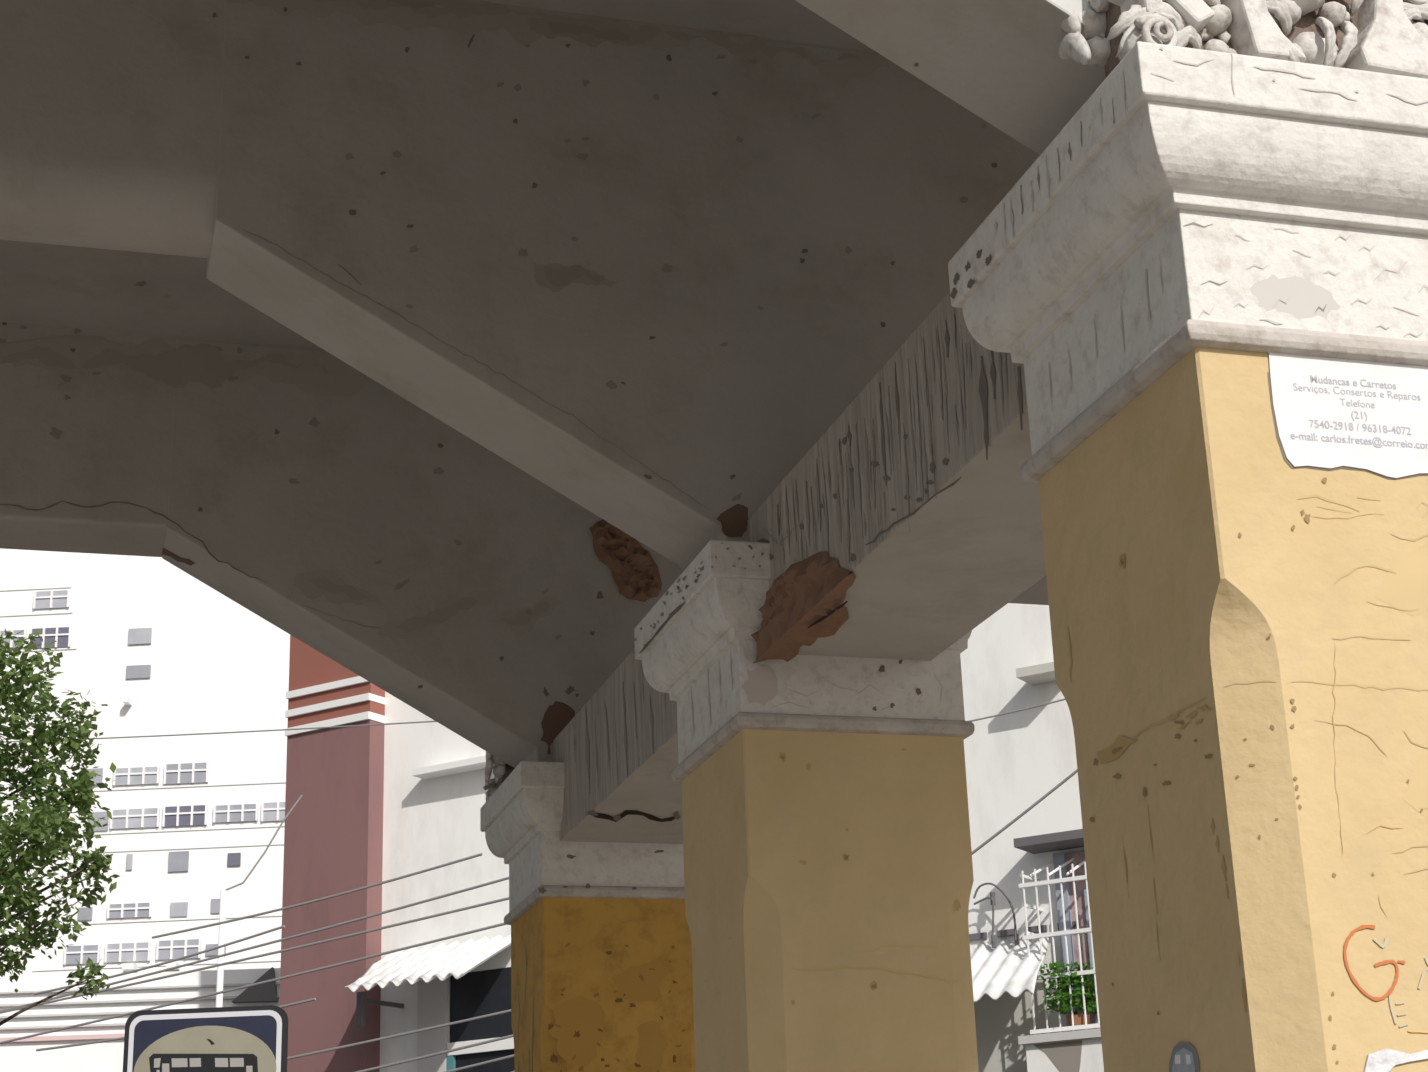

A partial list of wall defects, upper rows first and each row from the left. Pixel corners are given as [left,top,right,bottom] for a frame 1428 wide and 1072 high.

crack [0,501,265,582]
spalling [589,520,662,602]
spalling [751,551,856,663]
crack [1131,494,1428,874]
crack [594,810,675,822]